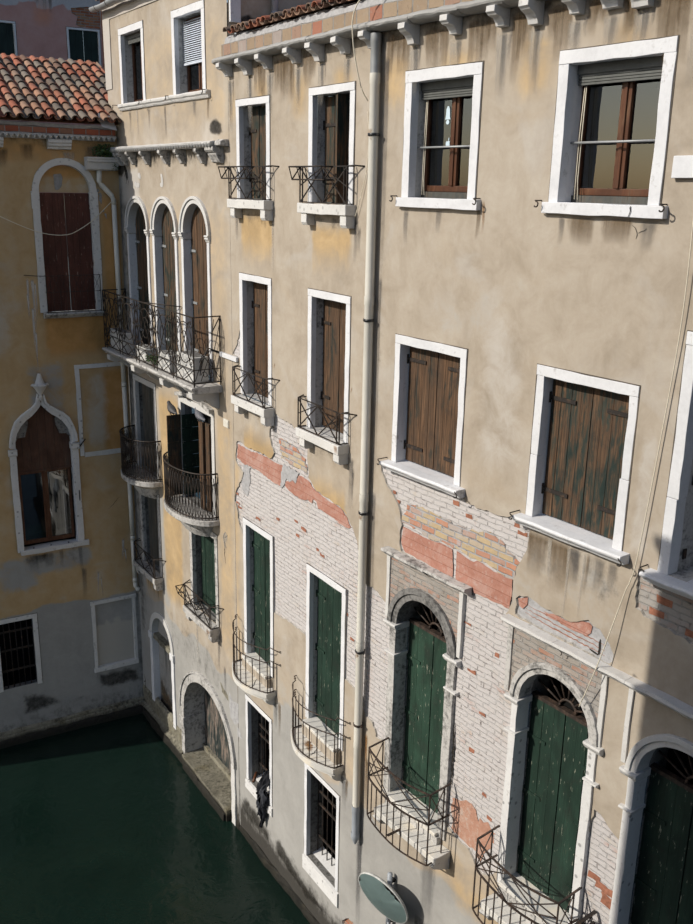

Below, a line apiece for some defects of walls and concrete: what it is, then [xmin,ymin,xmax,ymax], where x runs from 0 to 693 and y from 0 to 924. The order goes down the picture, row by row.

peeling [71,7,101,30]
peeling [235,413,390,740]
peeling [635,568,693,644]
peeling [381,466,614,876]
damp [243,800,268,837]
damp [276,842,321,909]
peeling [579,810,619,924]